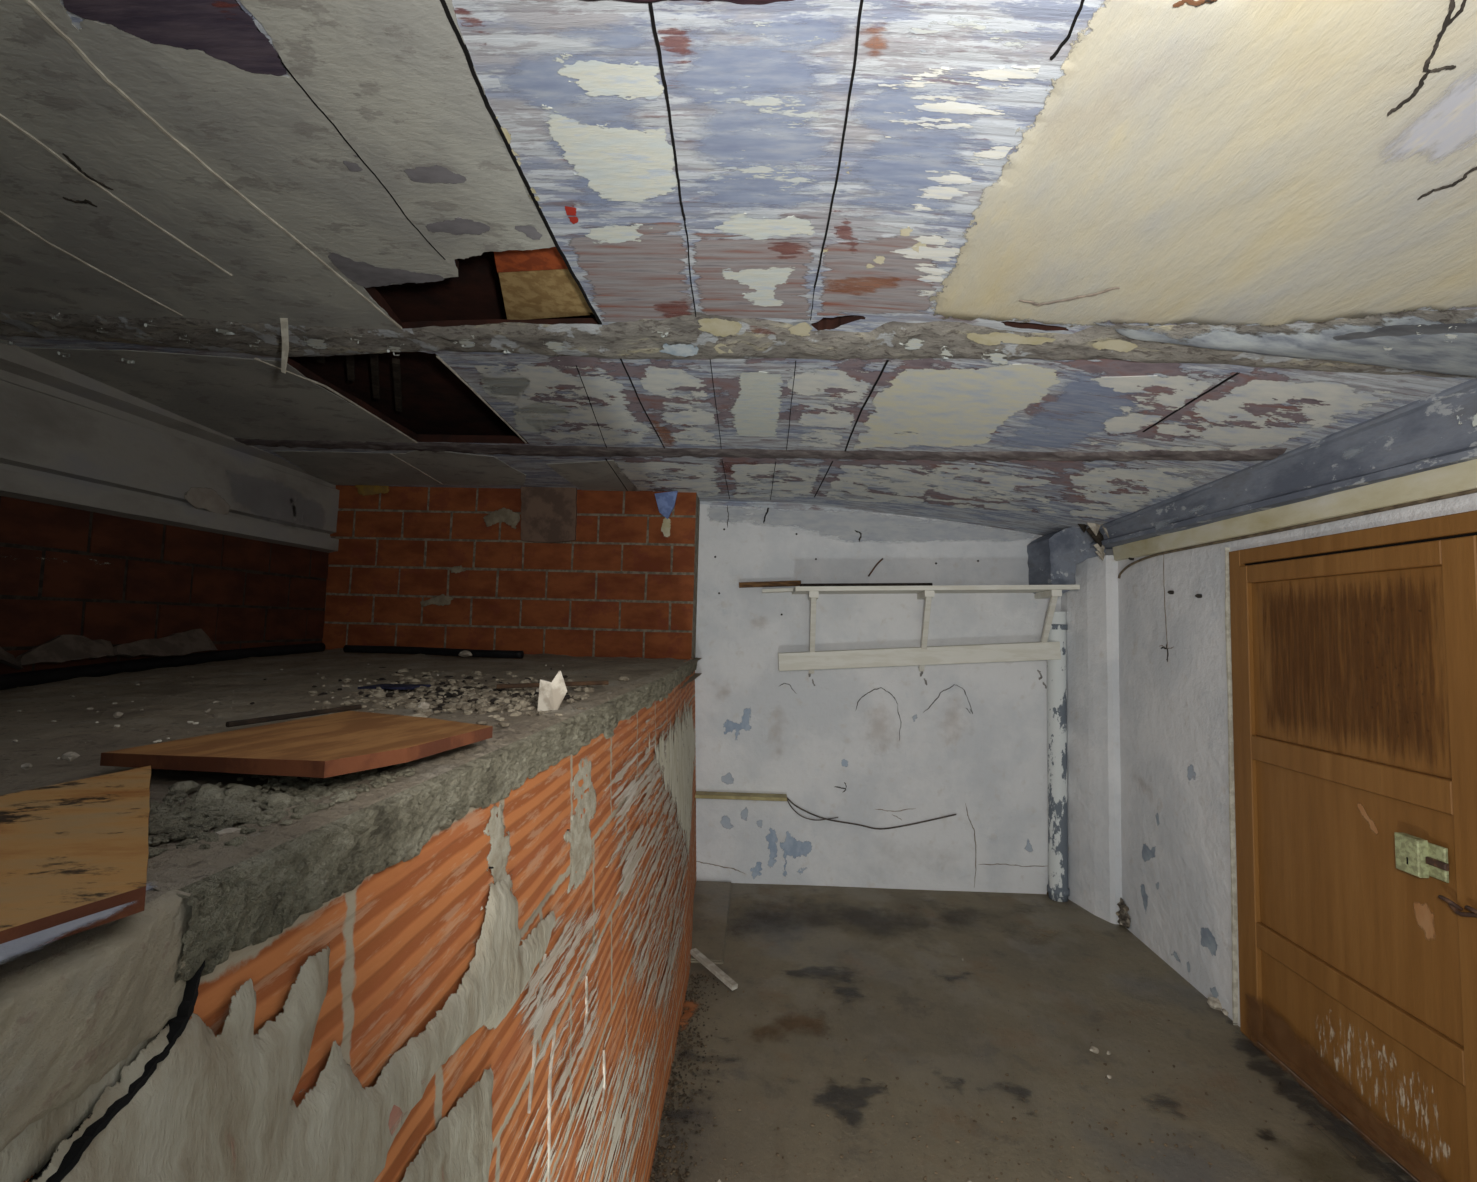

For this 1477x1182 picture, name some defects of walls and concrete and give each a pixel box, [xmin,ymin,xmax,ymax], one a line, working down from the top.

crack [1387,0,1467,116]
crack [1418,167,1477,200]
peeling [328,252,444,288]
peeling [474,15,1477,561]
peeling [723,708,752,740]
spalling [146,657,698,983]
peeling [721,808,812,879]
crack [28,960,205,1182]